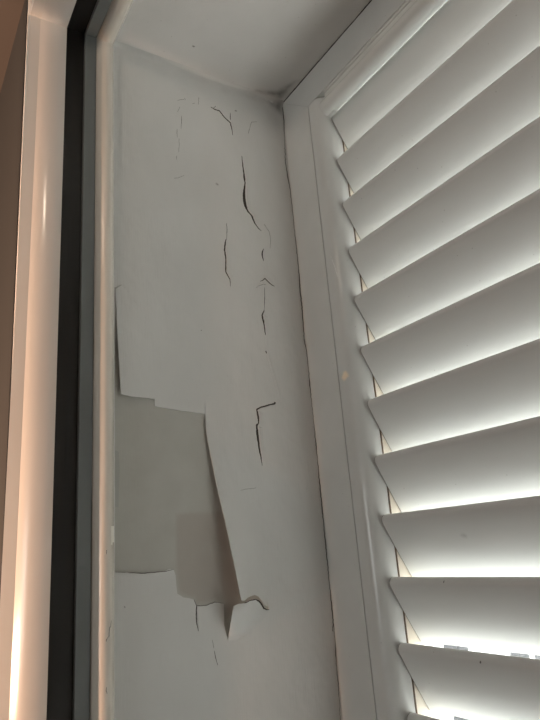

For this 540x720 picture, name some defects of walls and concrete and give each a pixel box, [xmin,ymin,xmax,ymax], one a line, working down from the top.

peeling [111,284,269,641]
crack [178,99,252,136]
crack [224,223,235,287]
crack [242,156,281,466]